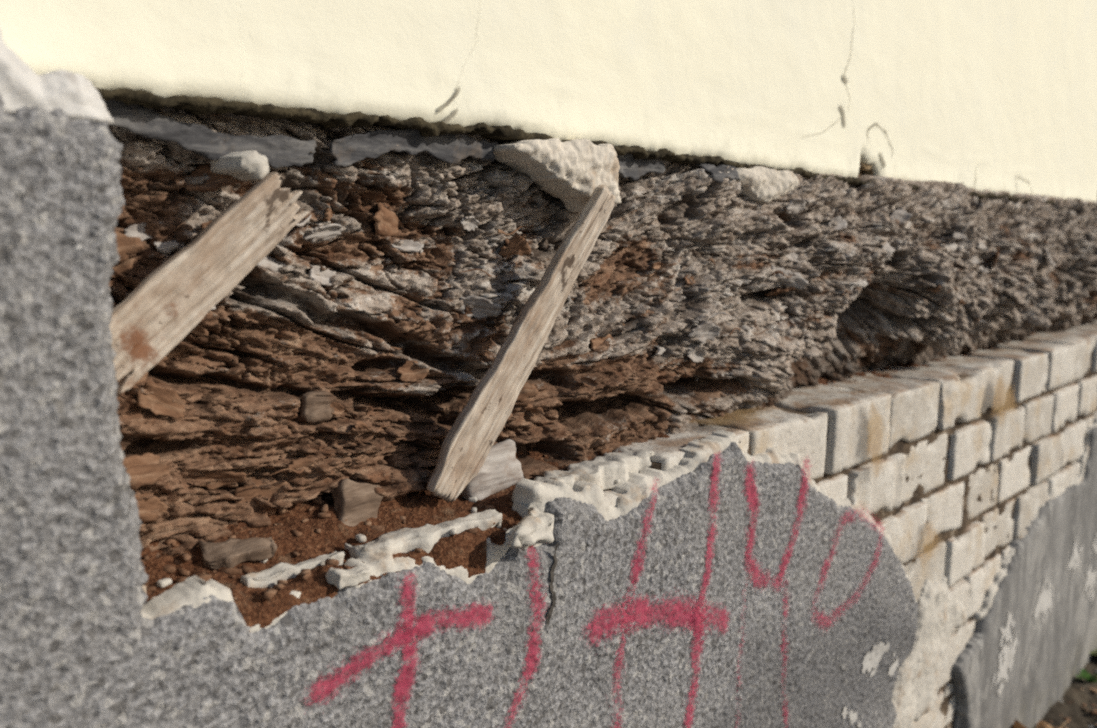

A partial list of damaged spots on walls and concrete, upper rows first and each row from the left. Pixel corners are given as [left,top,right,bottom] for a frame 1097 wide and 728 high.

crack [840,75,893,167]
peeling [110,222,179,278]
peeling [309,264,336,286]
peeling [304,203,343,243]
peeling [373,202,424,252]
peeling [123,453,170,524]
spalling [512,430,894,551]
spalling [971,412,1097,621]
spalling [344,541,513,588]
spalling [141,575,234,619]
peeling [862,642,908,679]
peeling [993,611,1018,696]